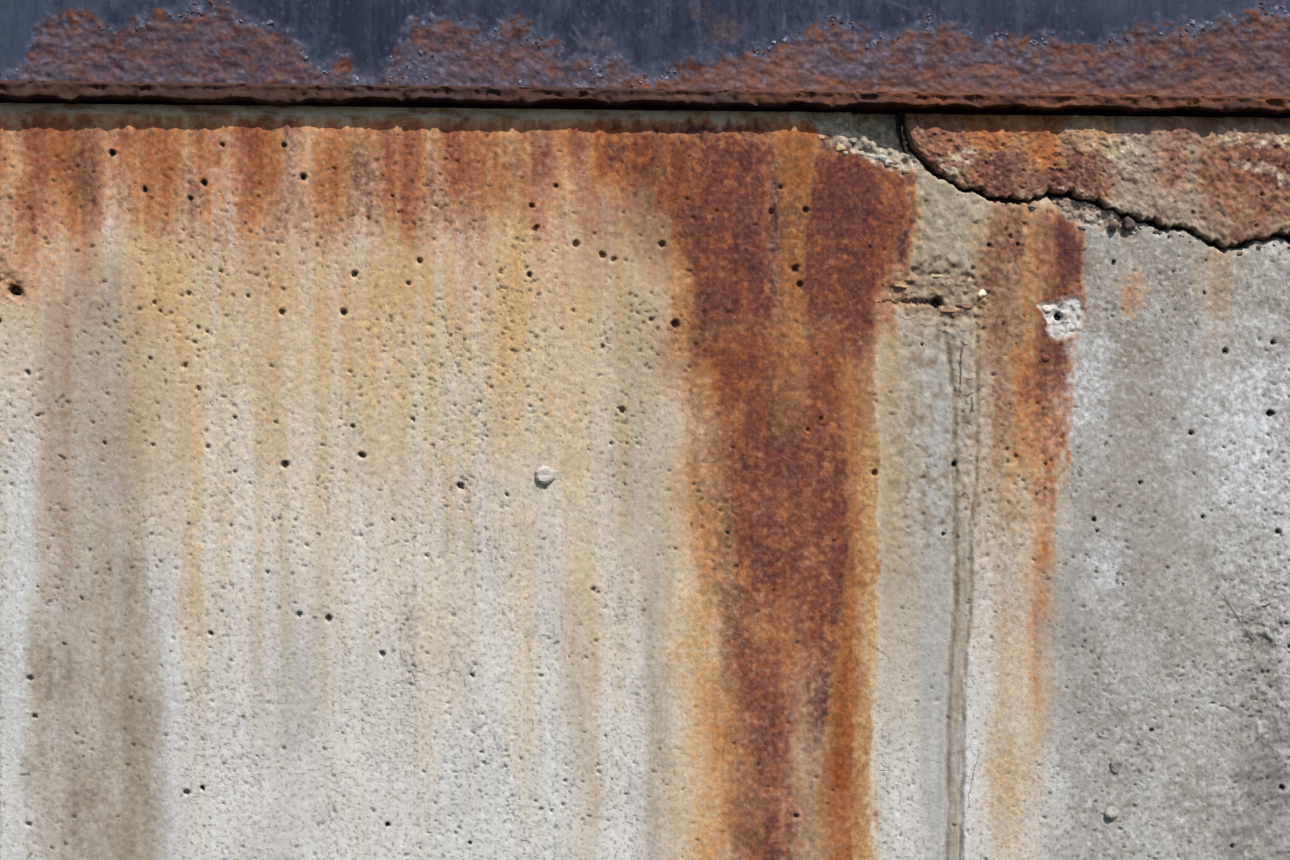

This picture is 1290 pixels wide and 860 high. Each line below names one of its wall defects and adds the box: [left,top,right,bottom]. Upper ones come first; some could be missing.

corrosion [0,0,1290,96]
crack [894,110,1290,255]
spalling [1036,293,1088,345]
corrosion [0,113,1116,860]